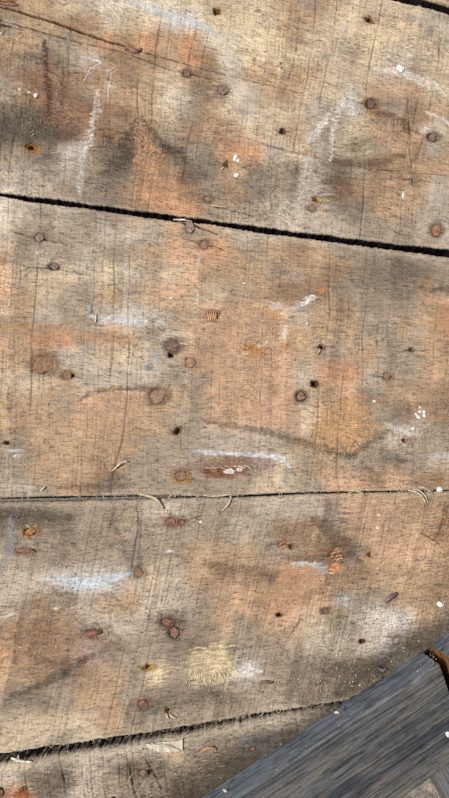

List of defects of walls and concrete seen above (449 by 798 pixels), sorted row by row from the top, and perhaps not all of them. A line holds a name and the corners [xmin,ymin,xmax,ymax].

crack [0,7,125,48]